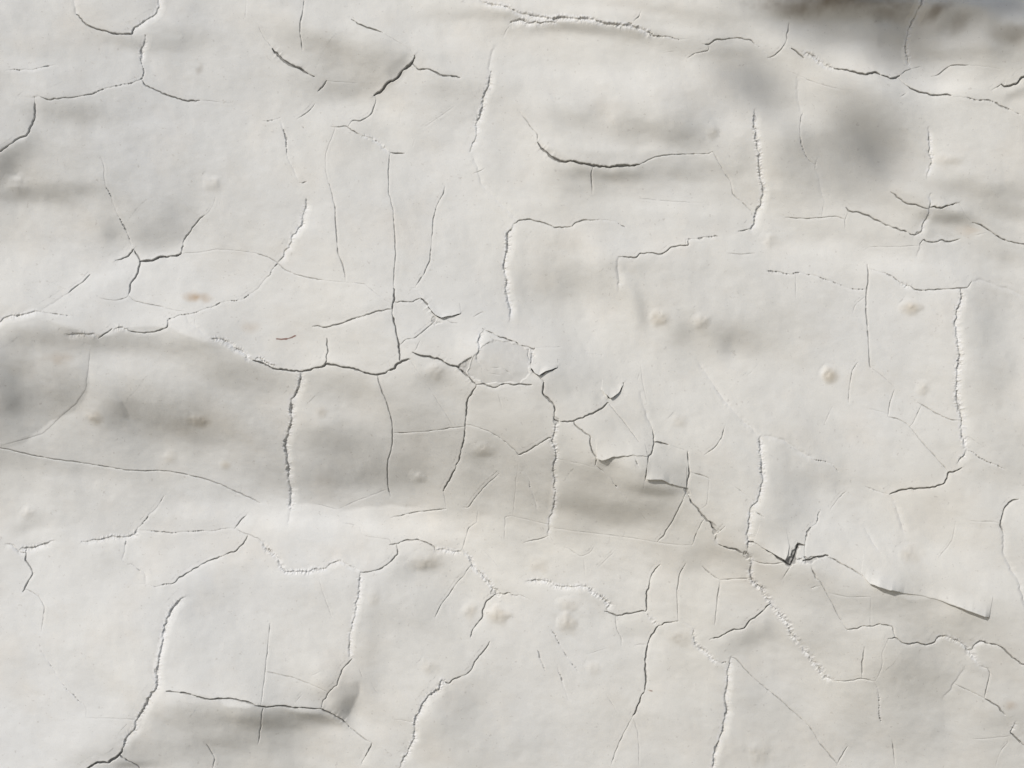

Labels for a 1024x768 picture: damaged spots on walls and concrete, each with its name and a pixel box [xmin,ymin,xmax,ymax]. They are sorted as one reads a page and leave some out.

crack [685,0,1024,121]
crack [0,0,716,549]
crack [517,102,1024,540]
peeling [596,438,692,498]
crack [0,533,62,635]
crack [36,470,534,768]
crack [520,353,1024,768]
peeling [741,524,821,569]
peeling [861,555,993,618]